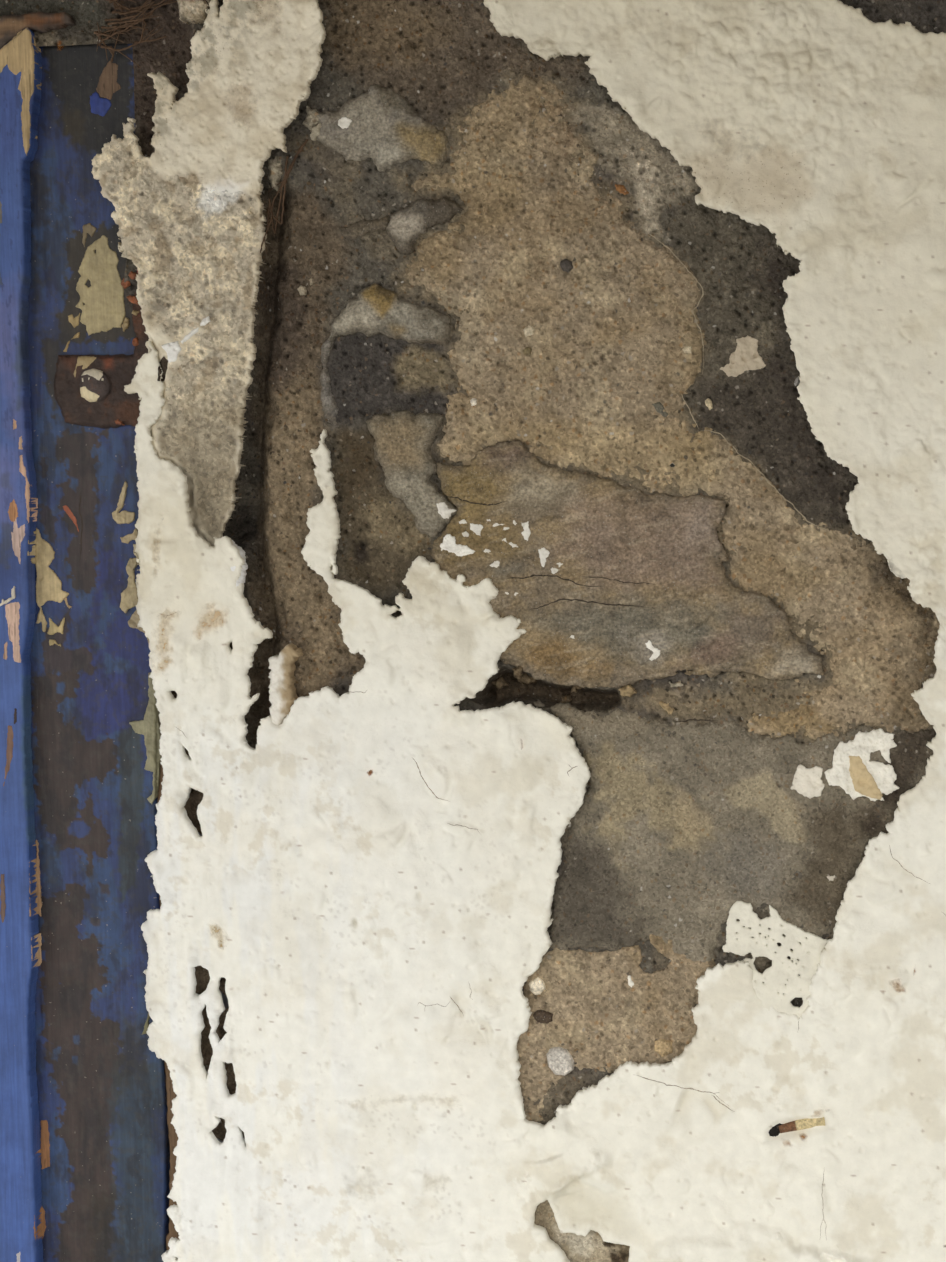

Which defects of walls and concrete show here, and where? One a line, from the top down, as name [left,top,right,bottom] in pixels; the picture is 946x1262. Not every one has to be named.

peeling [0,0,326,546]
peeling [0,586,21,663]
peeling [8,419,72,647]
peeling [112,481,149,643]
spalling [223,0,946,1125]
peeling [129,672,162,804]
spalling [184,788,203,834]
peeling [29,840,42,917]
spalling [195,966,236,1095]
peeling [35,1120,50,1169]
spalling [212,1118,227,1142]
spalling [534,1200,630,1262]